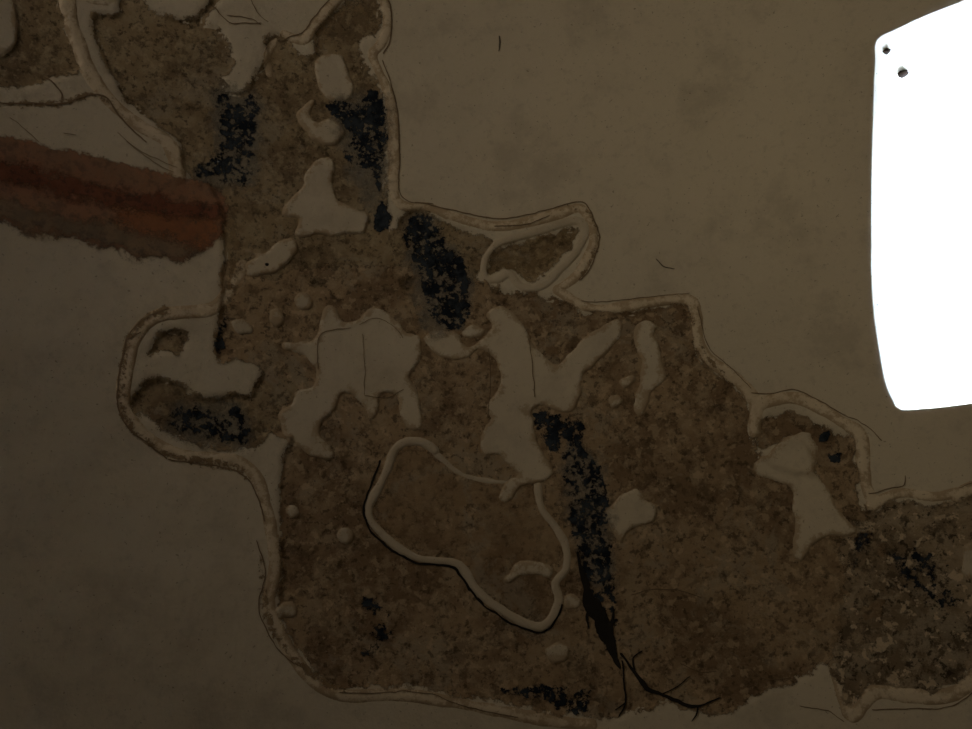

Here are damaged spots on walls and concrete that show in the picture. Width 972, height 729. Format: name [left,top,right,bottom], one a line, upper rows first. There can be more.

water stain [195,89,260,187]
spalling [0,0,598,502]
water stain [325,89,392,232]
water stain [402,212,471,331]
water stain [118,305,251,480]
crack [339,460,721,721]
water stain [532,411,621,651]
spalling [212,216,972,729]